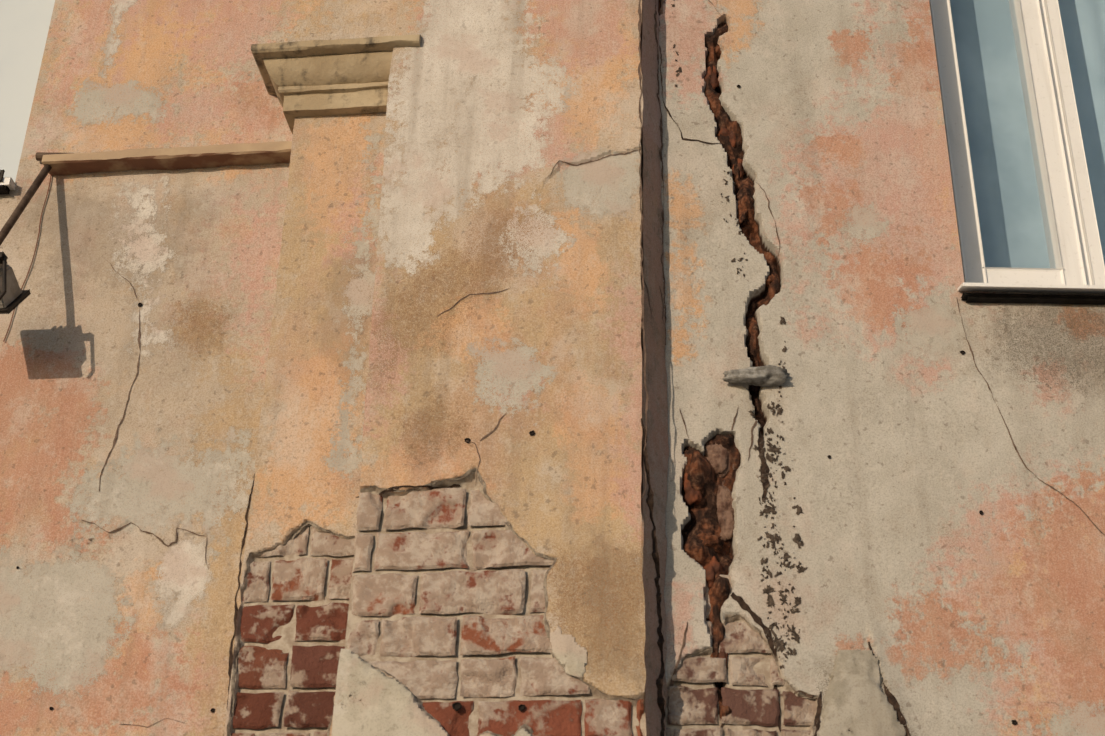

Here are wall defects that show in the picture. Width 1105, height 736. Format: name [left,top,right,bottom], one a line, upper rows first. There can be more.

peeling [317,0,642,480]
crack [99,258,141,491]
crack [550,0,781,736]
crack [957,299,1104,535]
crack [81,519,207,561]
crack [227,473,255,706]
flaking render [227,468,644,736]
flaking render [666,582,818,736]
crack [773,685,822,736]
crack [868,642,911,736]